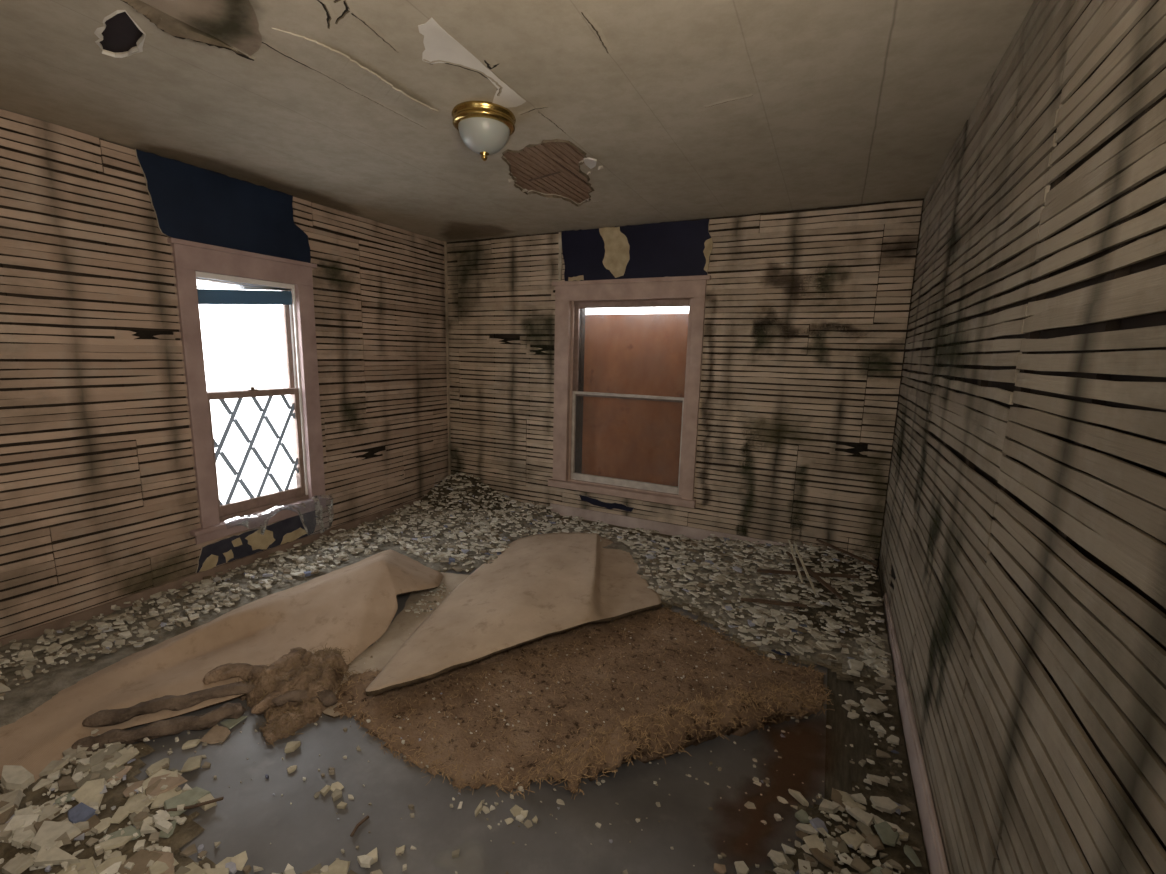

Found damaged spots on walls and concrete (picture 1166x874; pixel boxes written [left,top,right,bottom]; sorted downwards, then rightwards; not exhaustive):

peeling [94,0,262,61]
crack [262,40,428,129]
crack [317,0,569,133]
peeling [418,18,526,108]
peeling [135,149,311,263]
flaking render [501,139,604,207]
peeling [558,219,713,281]
leakage [767,266,846,296]
leakage [754,319,857,361]
leakage [738,420,800,536]
peeling [195,510,316,573]